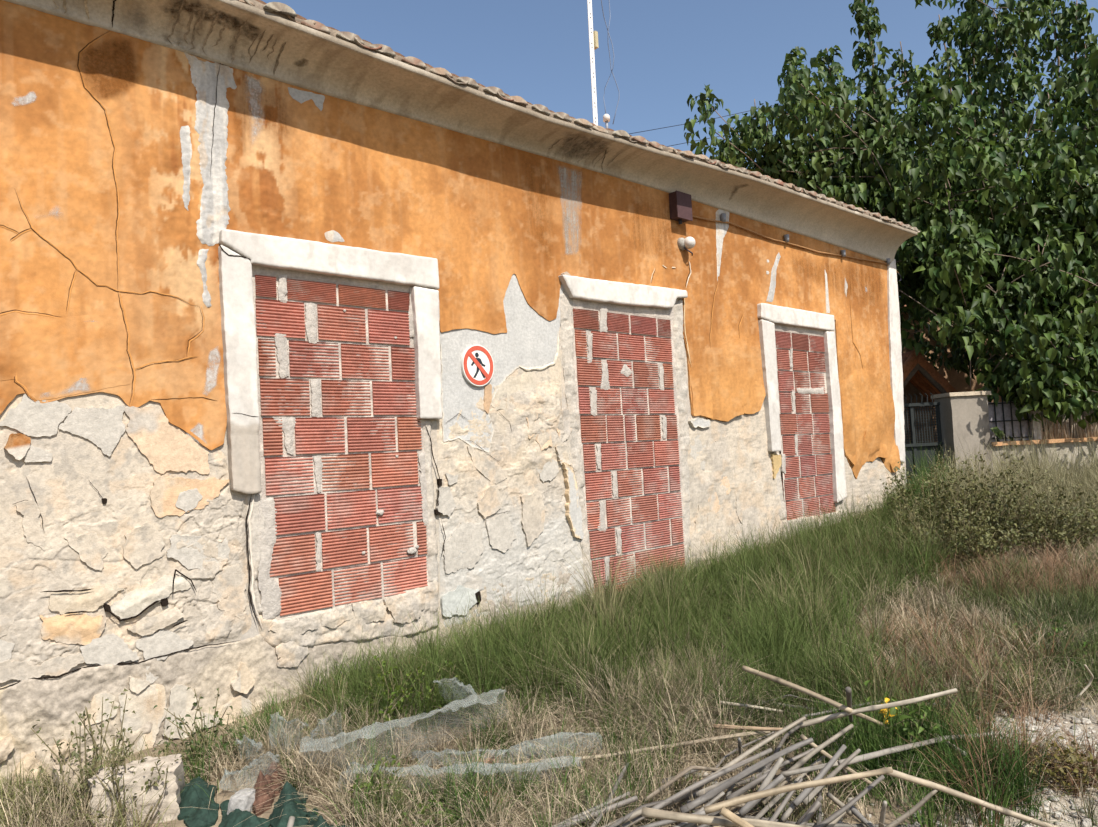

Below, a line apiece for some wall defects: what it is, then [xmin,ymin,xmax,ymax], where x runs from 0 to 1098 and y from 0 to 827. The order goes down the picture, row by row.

water stain [83,42,135,97]
water stain [166,0,286,74]
crack [0,0,259,417]
peeling [180,52,262,307]
crack [0,494,263,689]
spalling [0,378,265,755]
peeling [206,349,220,391]
spalling [422,272,594,627]
spalling [673,299,787,569]
spalling [844,455,905,514]
spalling [0,734,48,786]
spalling [51,739,76,764]